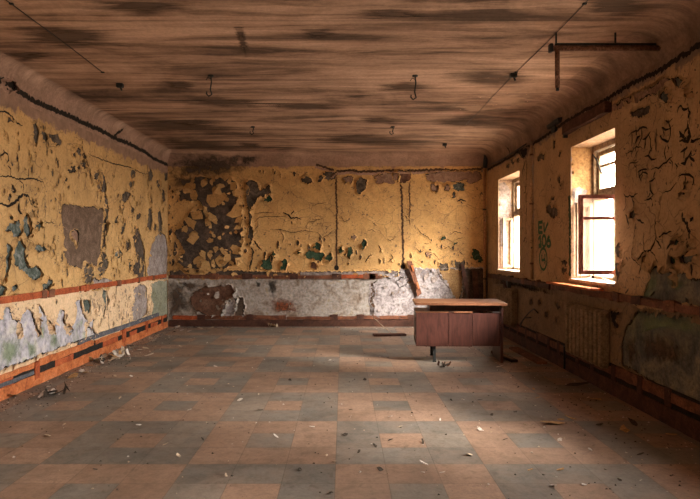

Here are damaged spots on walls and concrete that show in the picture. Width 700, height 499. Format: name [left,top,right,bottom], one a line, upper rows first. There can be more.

crack [0,151,45,214]
peeling [0,116,487,375]
crack [315,36,700,276]